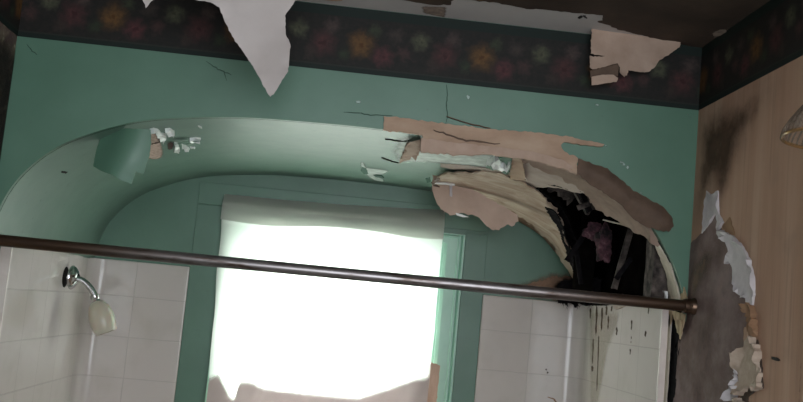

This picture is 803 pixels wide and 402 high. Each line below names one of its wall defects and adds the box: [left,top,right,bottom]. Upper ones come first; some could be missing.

peeling [475,0,770,48]
water stain [0,43,15,159]
peeling [93,128,201,184]
water stain [703,114,745,184]
spalling [361,139,633,292]
spalling [571,301,625,310]
flaking render [643,216,747,402]
spalling [427,362,440,402]